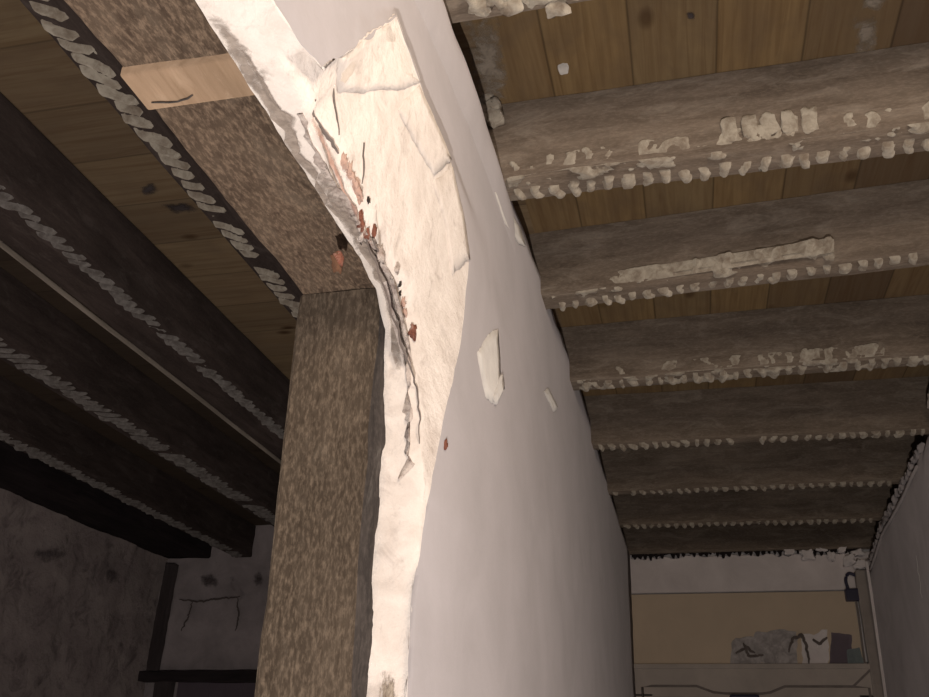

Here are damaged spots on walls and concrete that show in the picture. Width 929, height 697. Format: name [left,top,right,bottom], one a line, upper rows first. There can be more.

peeling [337,14,470,276]
spalling [297,114,417,479]
peeling [477,329,505,405]
crack [179,596,240,631]